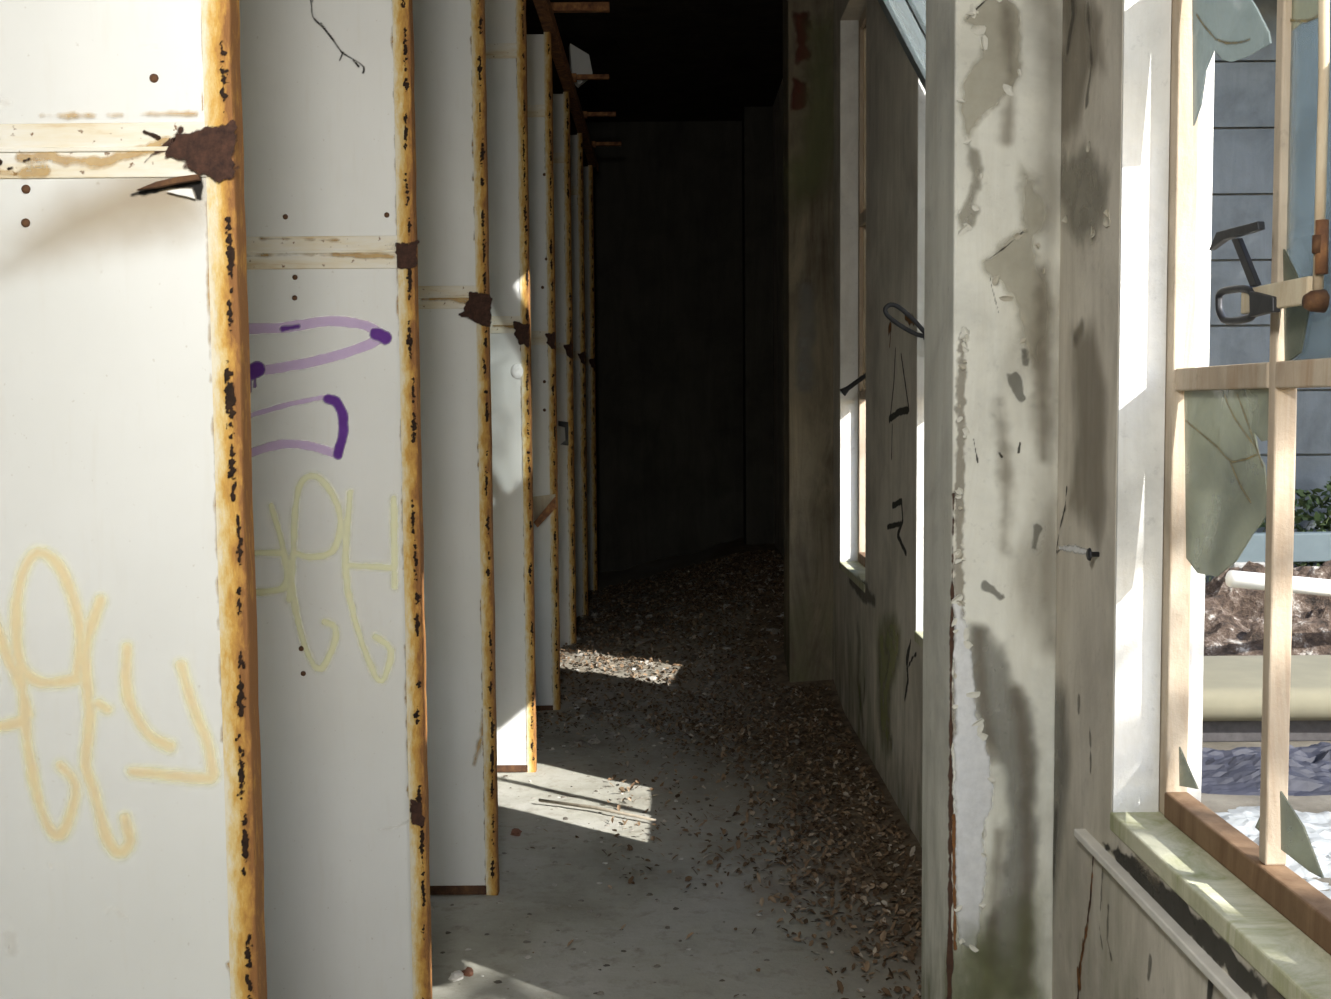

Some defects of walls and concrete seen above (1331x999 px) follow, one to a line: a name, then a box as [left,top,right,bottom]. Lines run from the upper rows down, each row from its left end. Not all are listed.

corrosion [17,41,239,183]
corrosion [392,28,410,90]
corrosion [470,0,483,86]
peeling [956,0,1021,236]
peeling [1060,141,1110,244]
peeling [984,181,1047,360]
corrosion [407,785,426,907]
corrosion [474,632,495,880]
peeling [951,594,996,953]
leakage [971,629,1035,996]
crack [1077,856,1094,999]